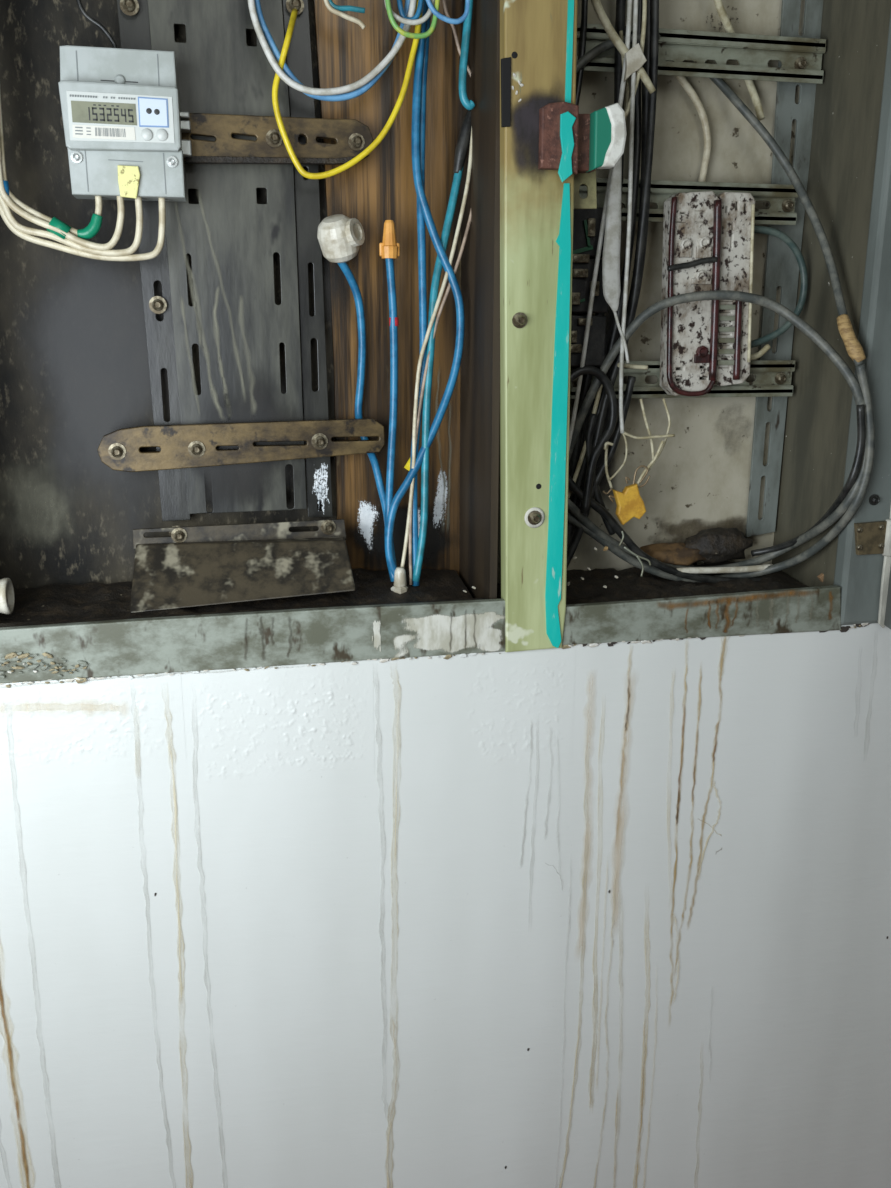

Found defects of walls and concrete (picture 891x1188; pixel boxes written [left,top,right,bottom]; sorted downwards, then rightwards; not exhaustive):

corrosion [669,592,805,681]
corrosion [620,689,630,790]
corrosion [671,671,720,933]
corrosion [611,808,622,932]
corrosion [0,987,29,1188]